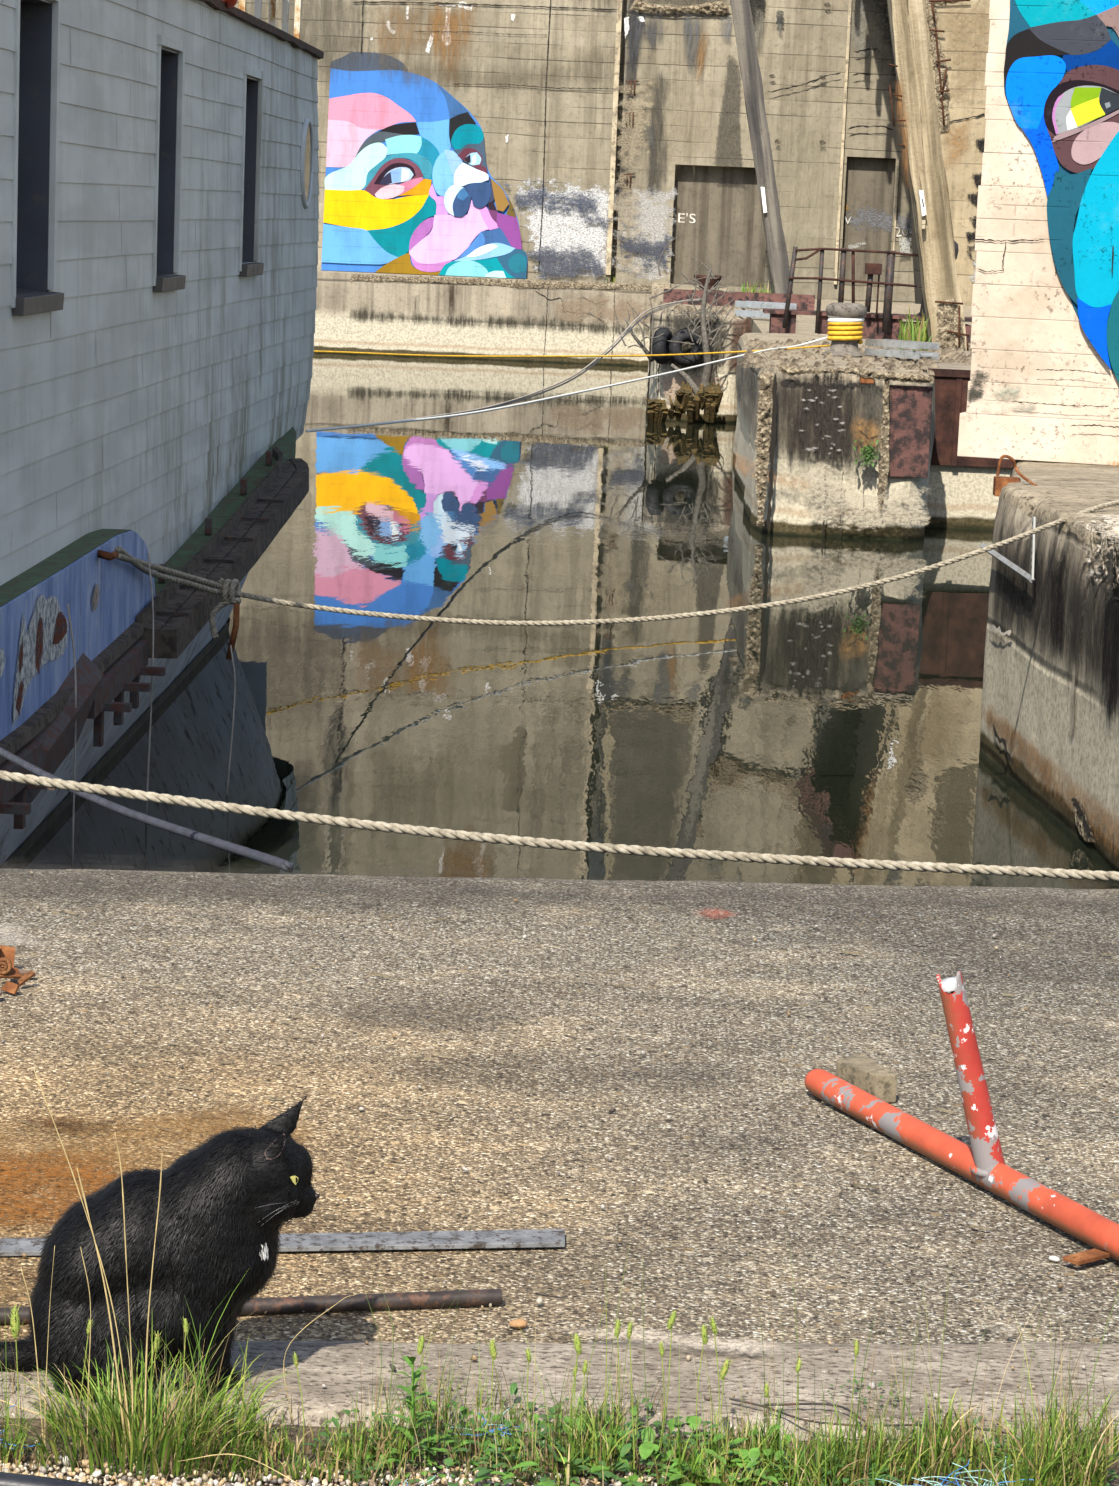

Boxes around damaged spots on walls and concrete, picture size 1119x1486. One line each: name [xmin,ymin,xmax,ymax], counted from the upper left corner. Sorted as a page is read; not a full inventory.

peeling [350,80,677,291]
damp [993,510,1119,734]
spalling [1077,514,1119,633]